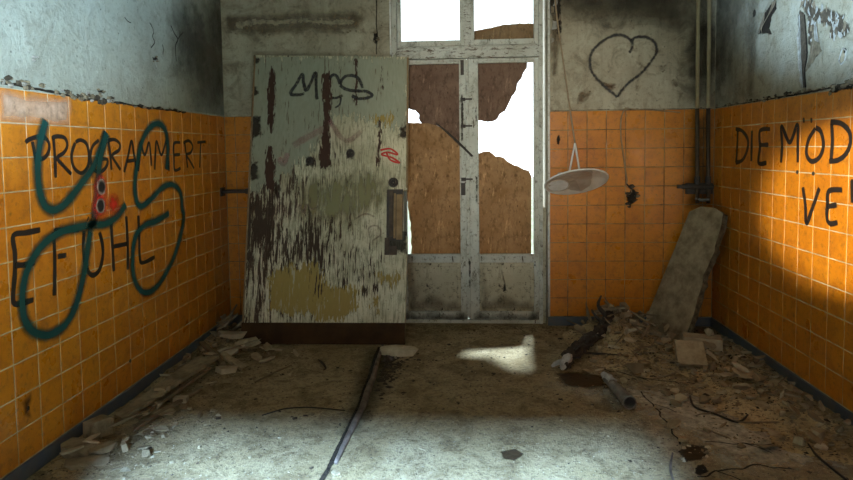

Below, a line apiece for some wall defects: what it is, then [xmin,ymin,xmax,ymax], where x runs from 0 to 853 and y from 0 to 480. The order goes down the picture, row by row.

spalling [0,75,186,113]
crack [124,17,183,55]
leakage [689,25,714,95]
peeling [663,0,853,110]
crack [601,367,695,444]